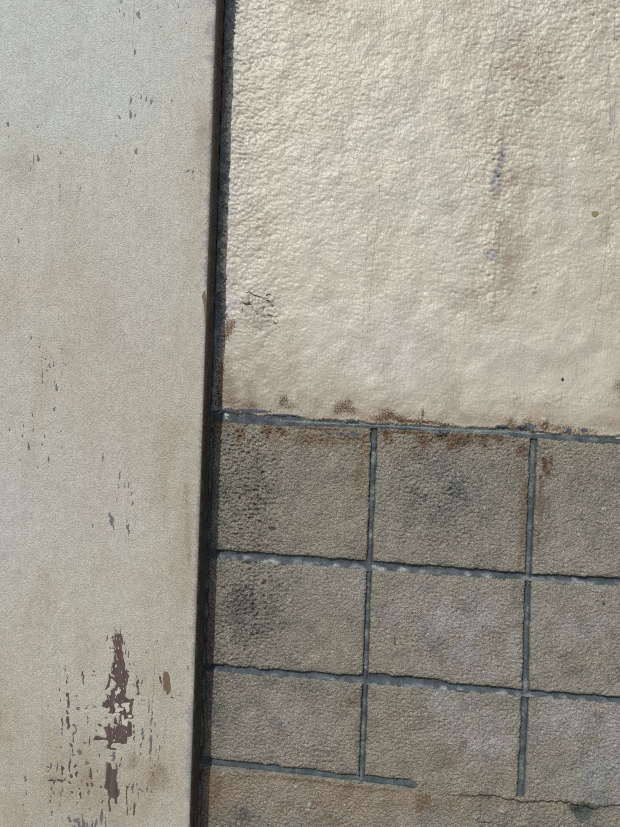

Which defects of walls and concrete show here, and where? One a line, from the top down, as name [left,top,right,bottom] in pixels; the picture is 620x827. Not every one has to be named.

rust [372,409,528,455]
rust [507,415,596,434]
peeling [46,629,160,827]